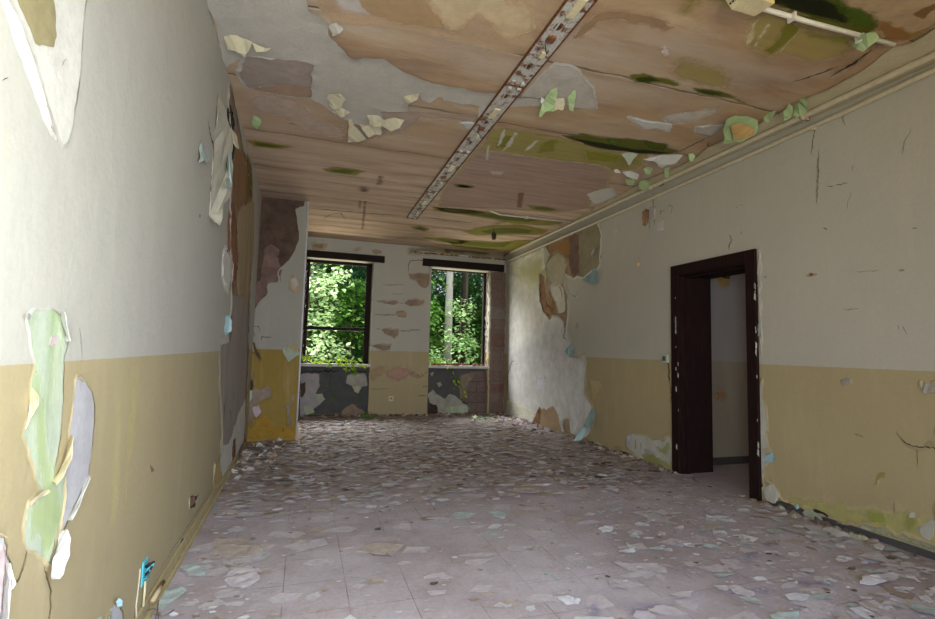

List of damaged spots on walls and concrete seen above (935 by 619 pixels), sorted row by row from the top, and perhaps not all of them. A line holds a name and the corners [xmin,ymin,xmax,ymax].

peeling [10,0,88,150]
peeling [207,0,564,142]
spalling [198,78,368,490]
spalling [370,260,431,308]
peeling [427,0,935,441]
peeling [21,306,95,579]
peeling [613,432,677,470]
spalling [756,375,935,553]
crack [896,431,935,469]
peeling [0,531,16,619]
peeling [94,598,124,619]